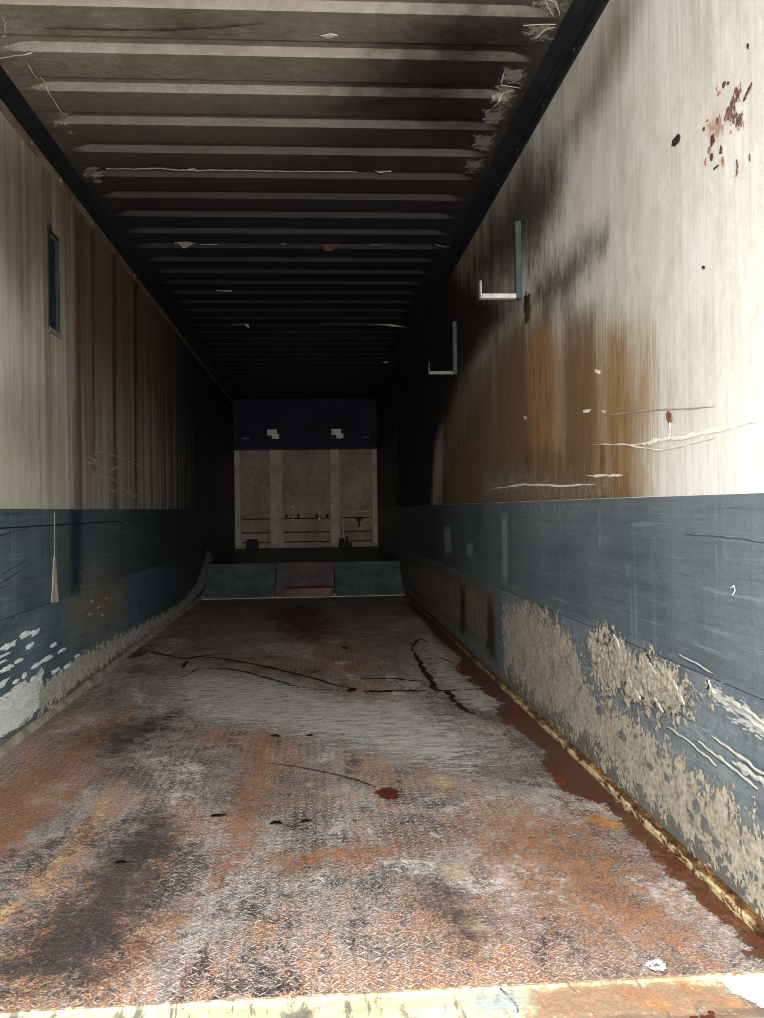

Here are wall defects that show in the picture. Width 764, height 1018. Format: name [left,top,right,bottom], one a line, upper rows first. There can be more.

leakage [396,157,649,506]
corrosion [0,771,126,925]
peeling [0,549,213,741]
corrosion [212,713,400,890]
crack [141,638,489,714]
corrosion [269,840,442,872]
corrosion [403,602,764,959]
peeling [405,559,764,919]
corrosion [521,975,754,1018]
peeling [719,975,764,1008]